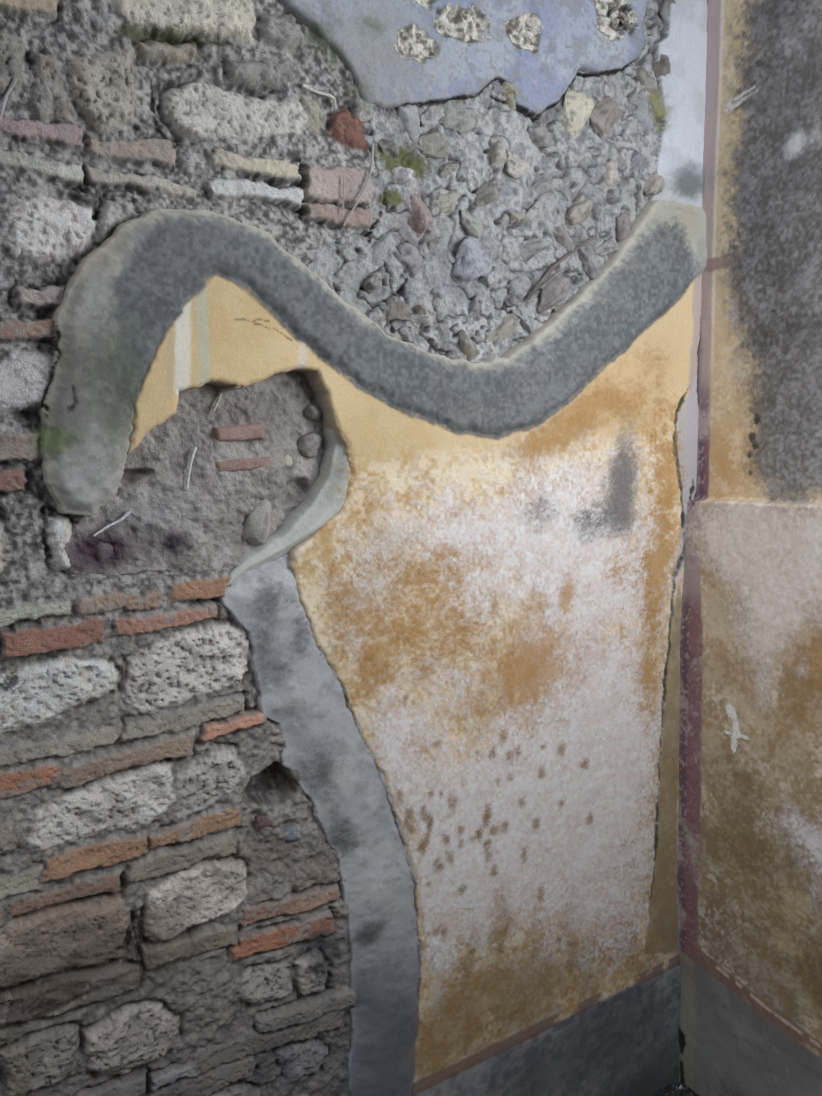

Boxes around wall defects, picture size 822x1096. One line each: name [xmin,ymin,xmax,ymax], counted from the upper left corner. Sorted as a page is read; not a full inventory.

spalling [64,371,325,577]
water stain [108,220,695,439]
spalling [306,0,676,363]
water stain [319,435,673,997]
crack [646,341,700,919]
water stain [678,165,704,196]
water stain [684,0,822,708]
water stain [780,805,822,898]